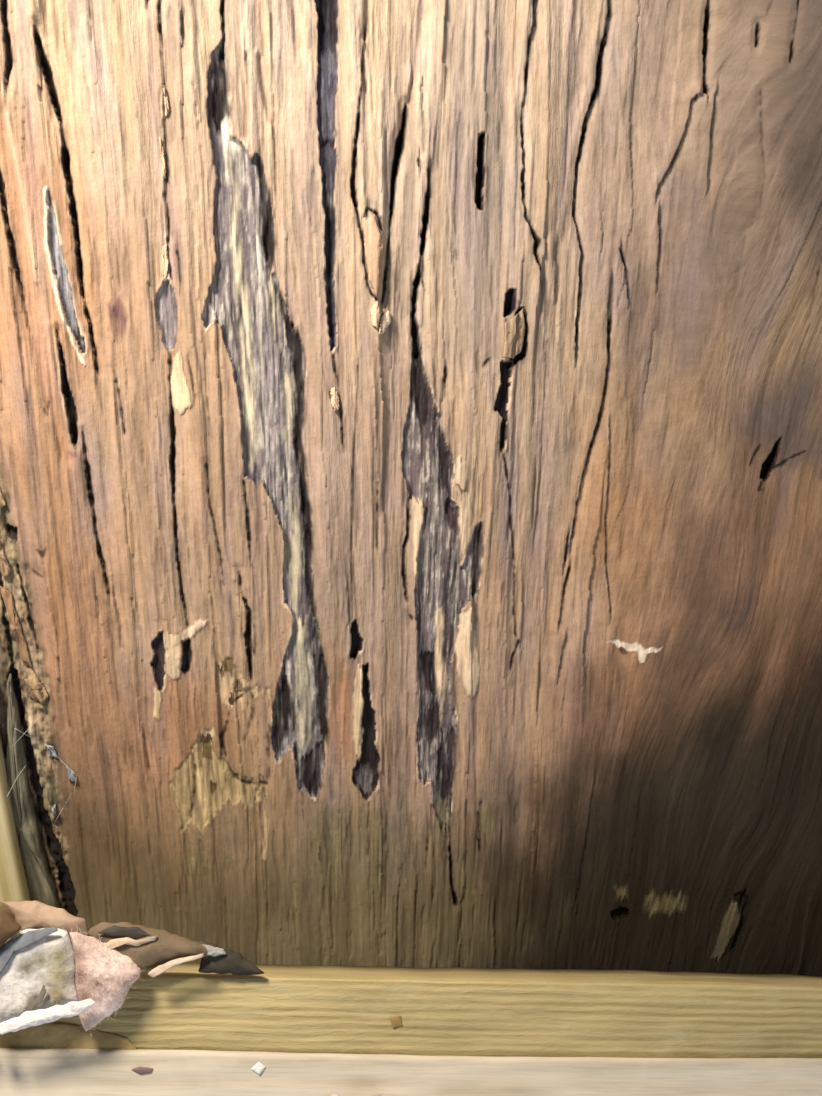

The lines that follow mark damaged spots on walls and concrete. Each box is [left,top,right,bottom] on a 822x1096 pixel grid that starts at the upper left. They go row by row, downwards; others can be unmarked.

crack [0,0,125,434]
crack [519,0,541,283]
crack [572,0,609,344]
crack [665,0,714,175]
peeling [0,541,49,704]
crack [47,331,110,594]
peeling [201,726,216,759]
peeling [216,654,271,717]
crack [503,454,519,669]
crack [563,320,610,595]
spalling [610,639,662,663]
crack [749,444,806,491]